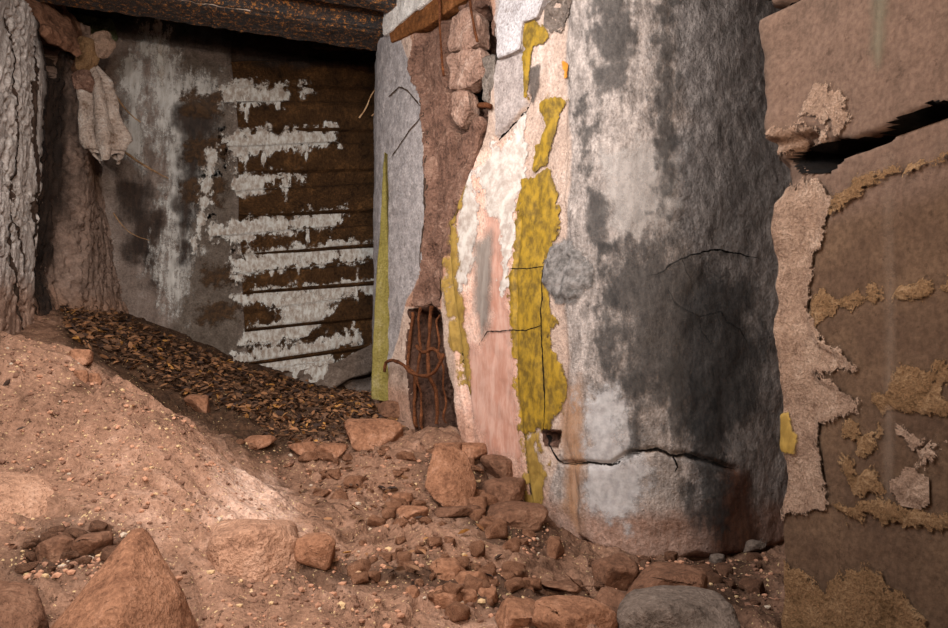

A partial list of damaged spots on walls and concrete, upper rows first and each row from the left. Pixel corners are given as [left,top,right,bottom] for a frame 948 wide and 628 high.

damp [117,18,377,383]
spalling [405,12,471,431]
spalling [475,91,490,121]
spalling [487,1,500,67]
damp [572,93,599,176]
crack [460,266,732,494]
damp [586,188,647,458]
damp [646,0,682,196]
damp [663,358,731,539]
crack [661,249,757,273]
spalling [771,151,948,534]
crack [790,100,948,174]